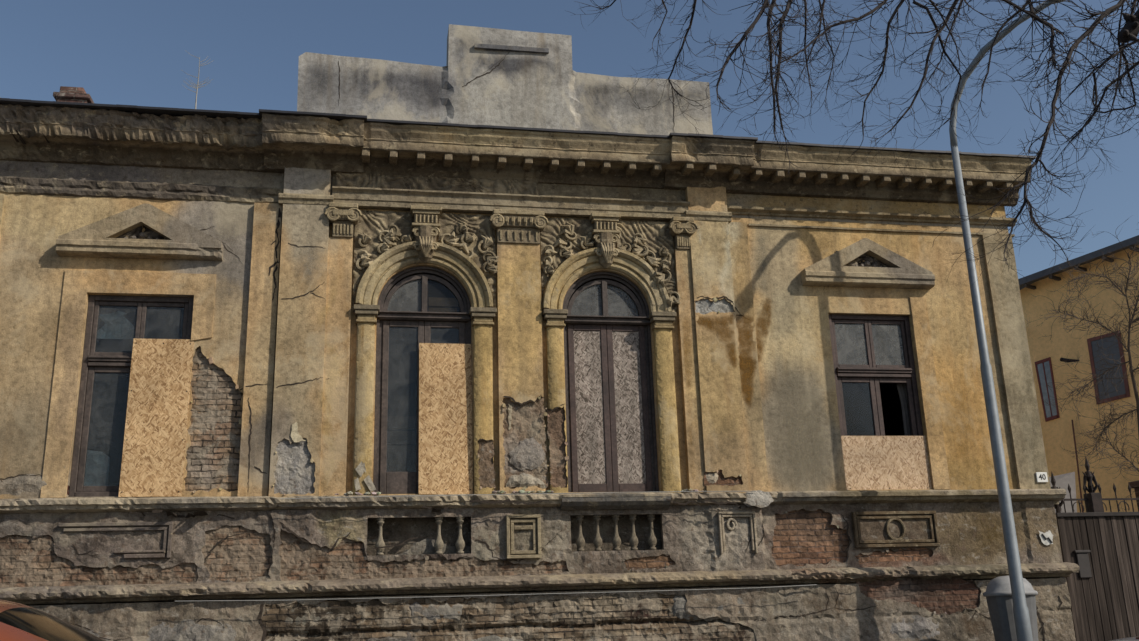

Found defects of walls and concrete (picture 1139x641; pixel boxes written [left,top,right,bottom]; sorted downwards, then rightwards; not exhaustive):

crack [269,208,325,300]
flaking render [695,297,734,315]
flaking render [184,347,243,493]
flaking render [273,422,315,495]
flaking render [477,397,569,490]
flaking render [704,470,932,567]
flaking render [0,525,569,588]
flaking render [260,592,756,641]
flaking render [856,577,980,615]